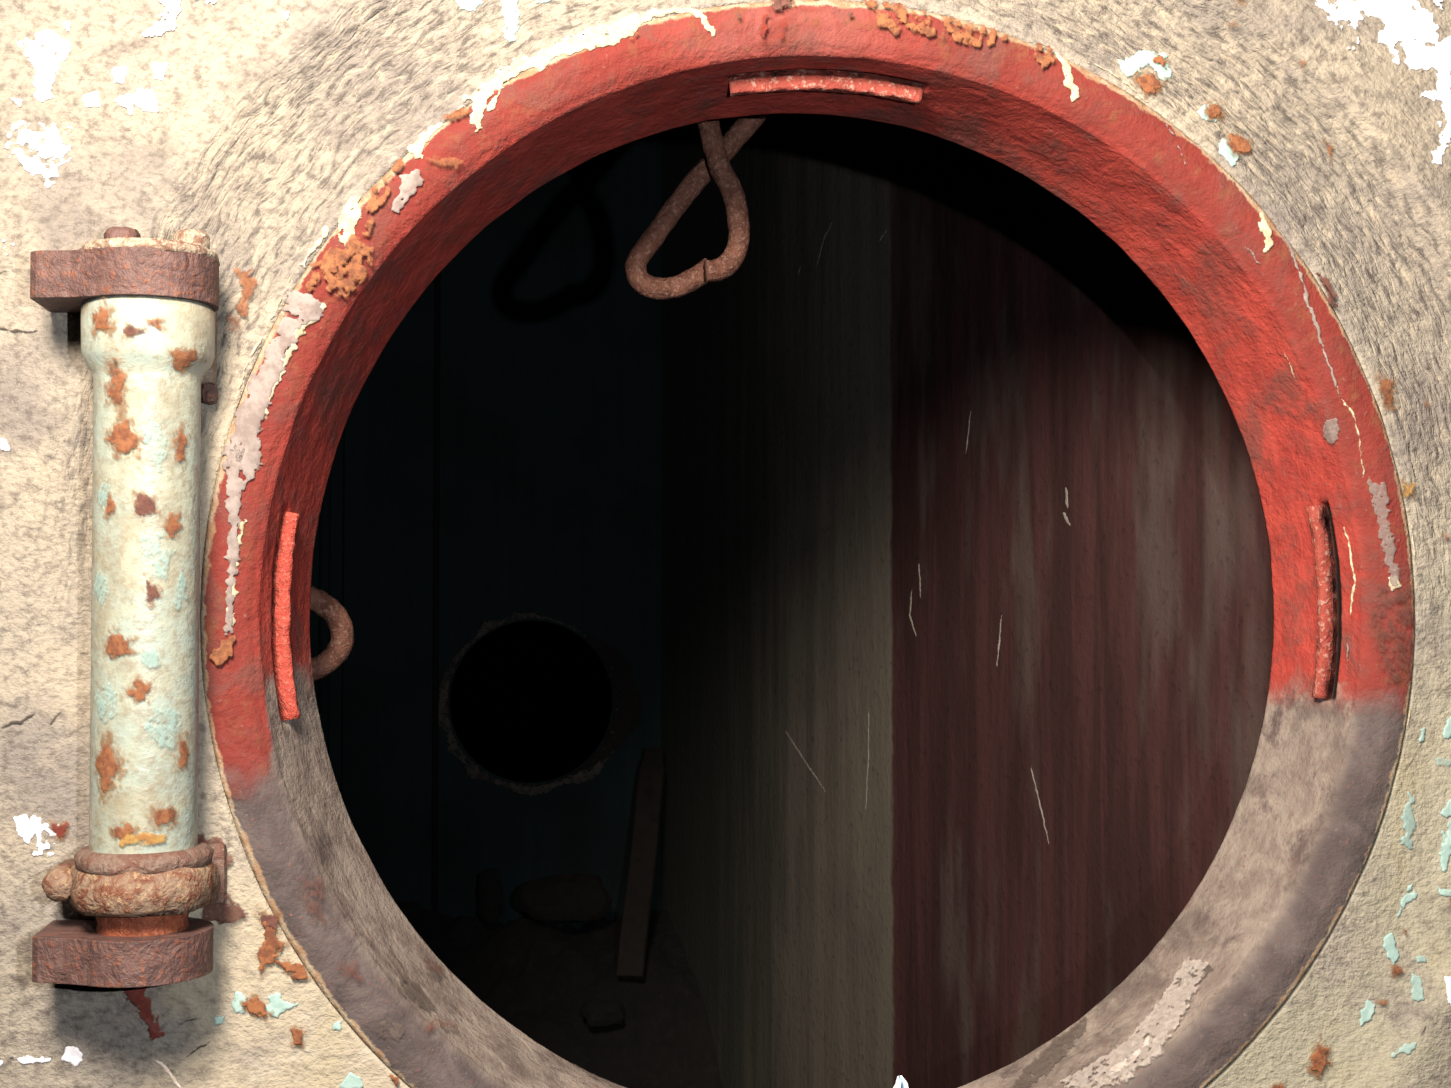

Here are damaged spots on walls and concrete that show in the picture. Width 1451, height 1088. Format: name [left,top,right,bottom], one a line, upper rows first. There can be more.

peeling [5,21,72,188]
peeling [453,0,716,132]
peeling [1315,0,1451,165]
peeling [391,122,444,213]
rust [92,300,161,338]
rust [104,358,145,460]
peeling [209,196,362,666]
rust [133,491,183,538]
rust [103,626,138,659]
rust [110,806,177,847]
rust [202,893,314,980]
peeling [0,1046,83,1066]